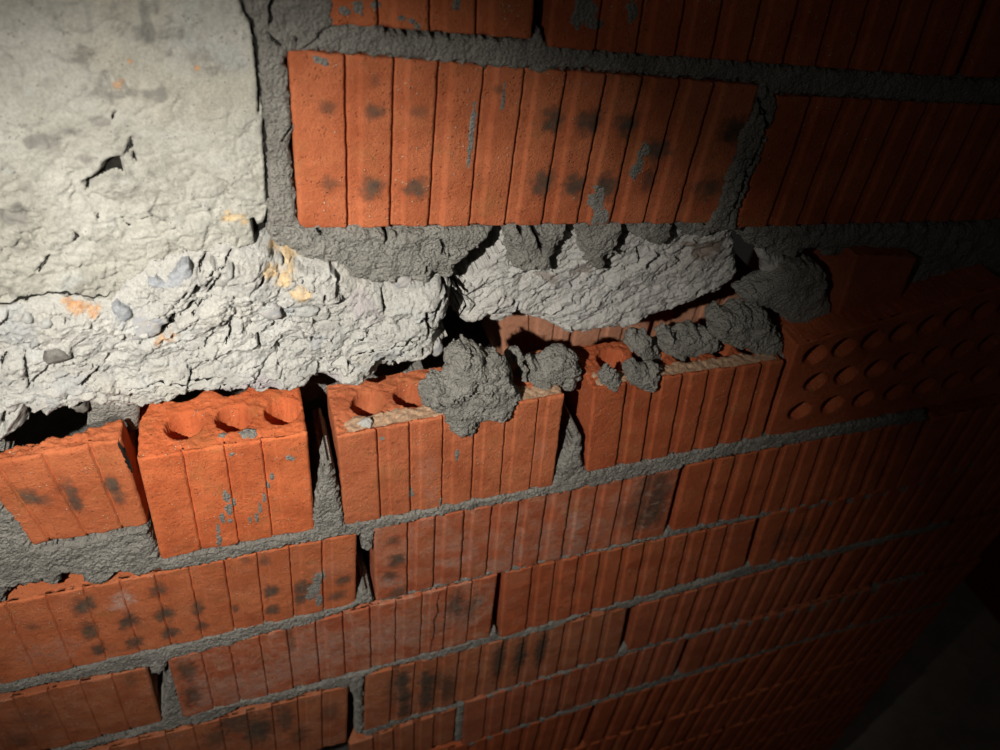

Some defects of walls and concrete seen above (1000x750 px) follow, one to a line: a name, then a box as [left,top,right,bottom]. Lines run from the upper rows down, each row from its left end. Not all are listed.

spalling [85,137,137,189]
spalling [754,247,785,272]
spalling [0,215,736,440]